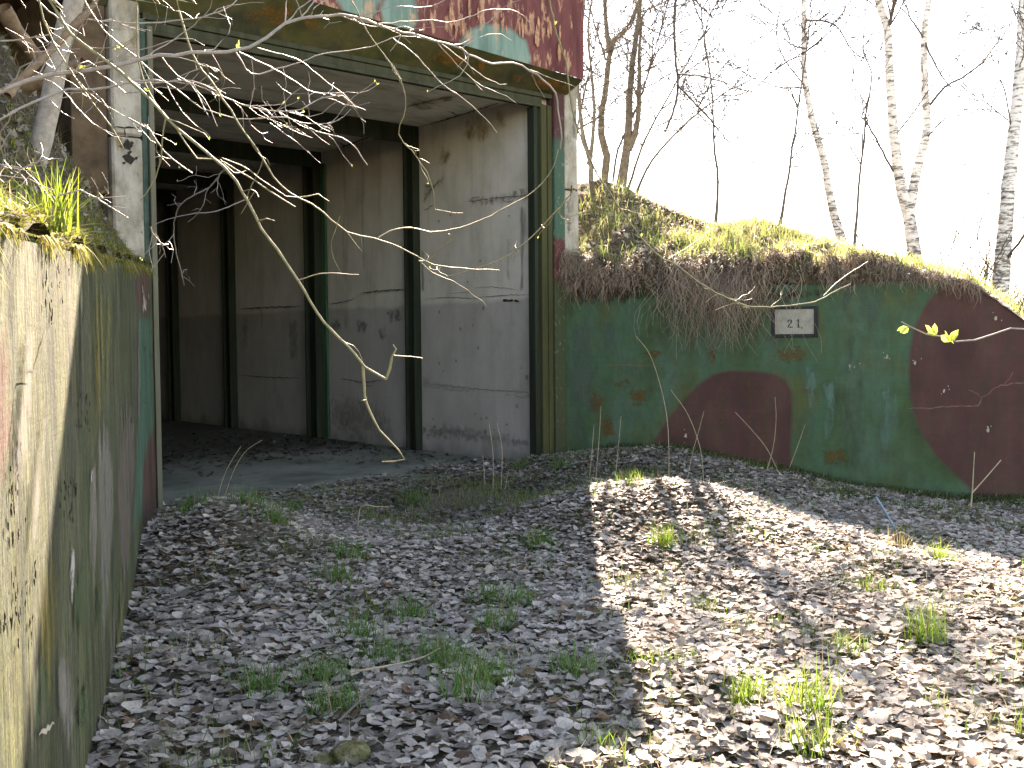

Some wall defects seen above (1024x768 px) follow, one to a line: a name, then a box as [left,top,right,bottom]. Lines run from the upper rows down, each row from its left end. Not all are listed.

peeling [449,0,480,37]
peeling [501,12,566,61]
crack [466,194,527,202]
crack [905,372,1024,409]